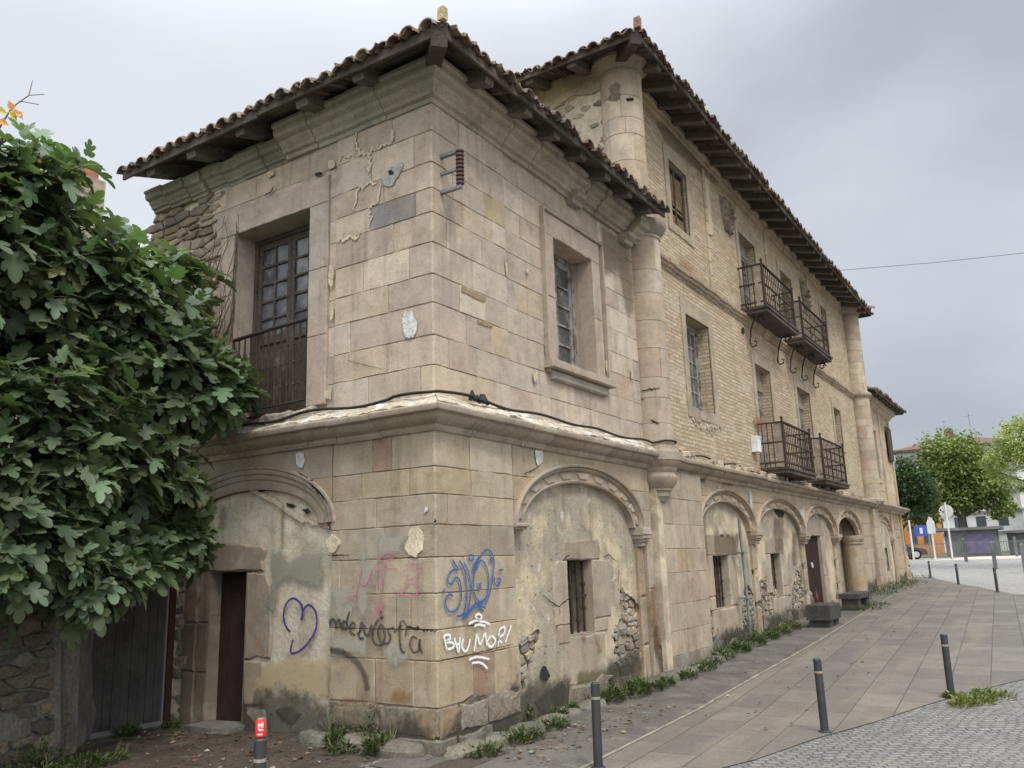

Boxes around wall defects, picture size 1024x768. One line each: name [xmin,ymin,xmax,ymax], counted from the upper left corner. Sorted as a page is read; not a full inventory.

spalling [250,490,340,553]
flaking render [742,567,814,631]
flaking render [519,633,537,681]
flaking render [611,593,640,674]
water stain [242,692,327,734]